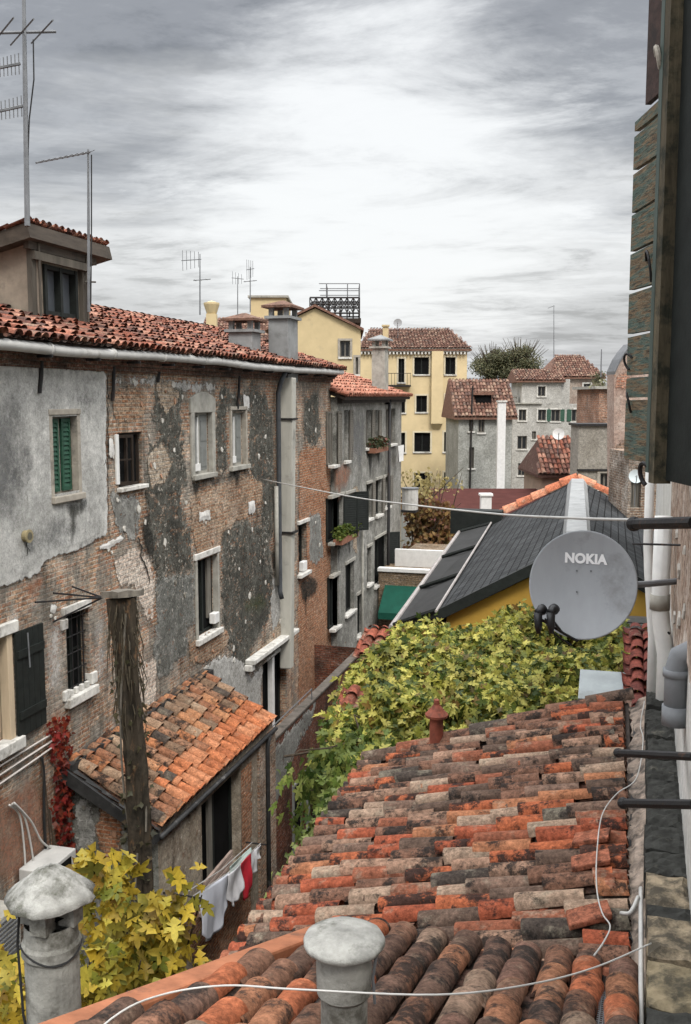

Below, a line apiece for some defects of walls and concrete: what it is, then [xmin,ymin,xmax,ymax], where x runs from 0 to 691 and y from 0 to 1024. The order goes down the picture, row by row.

peeling [107,375,281,705]
flaking render [276,388,332,802]